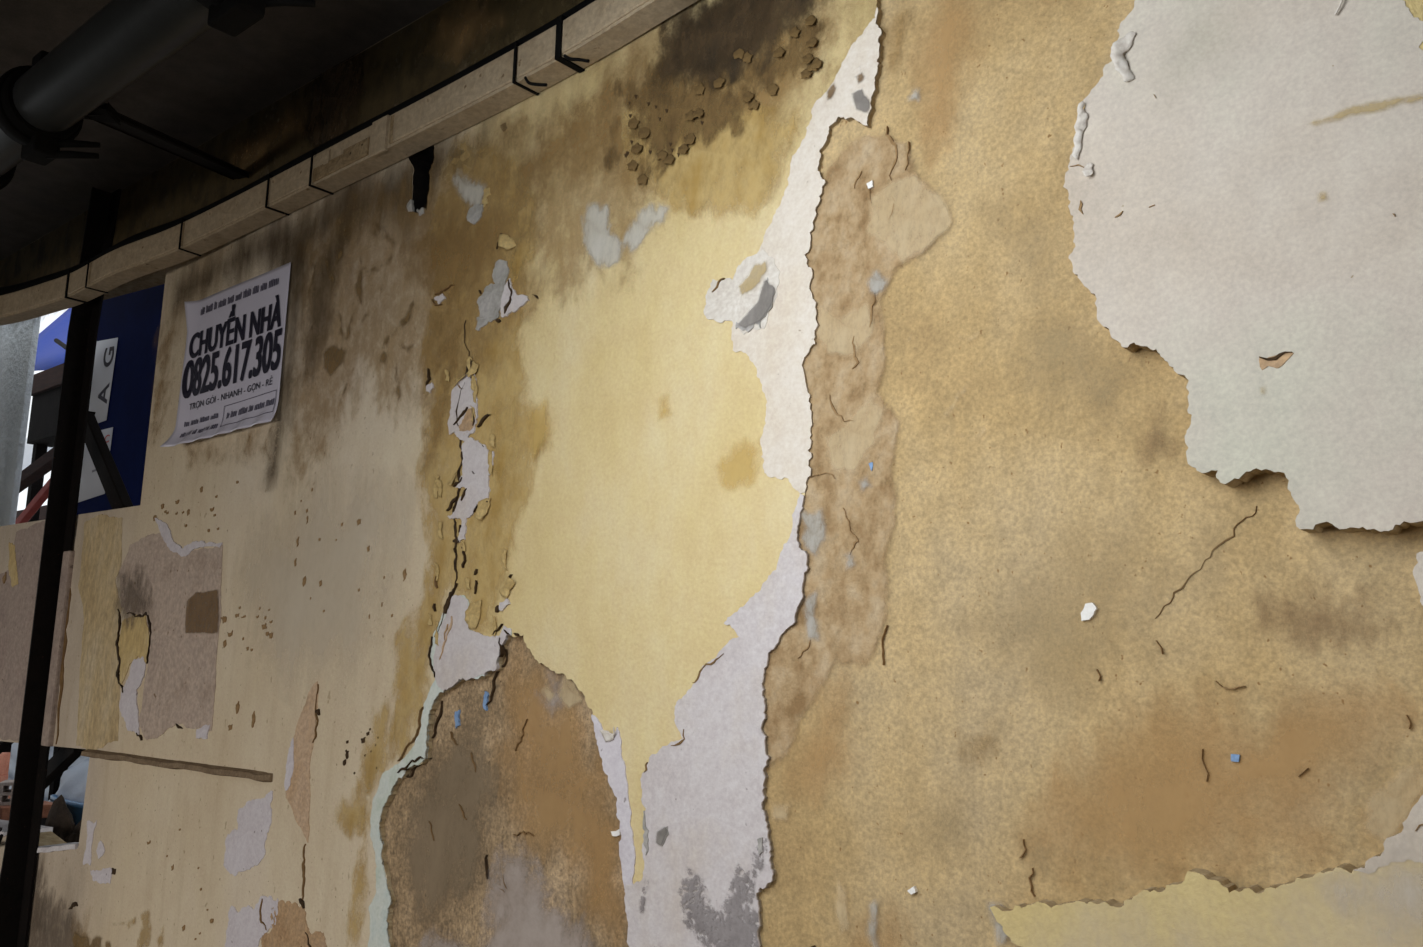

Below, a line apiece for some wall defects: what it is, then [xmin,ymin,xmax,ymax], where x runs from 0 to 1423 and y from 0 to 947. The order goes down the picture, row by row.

damp [112,78,319,246]
peeling [76,486,273,750]
peeling [294,488,325,612]
damp [177,0,828,837]
flaking render [343,0,1423,947]
peeling [223,681,320,876]
damp [28,863,110,947]
damp [132,912,162,947]
peeling [182,896,327,947]